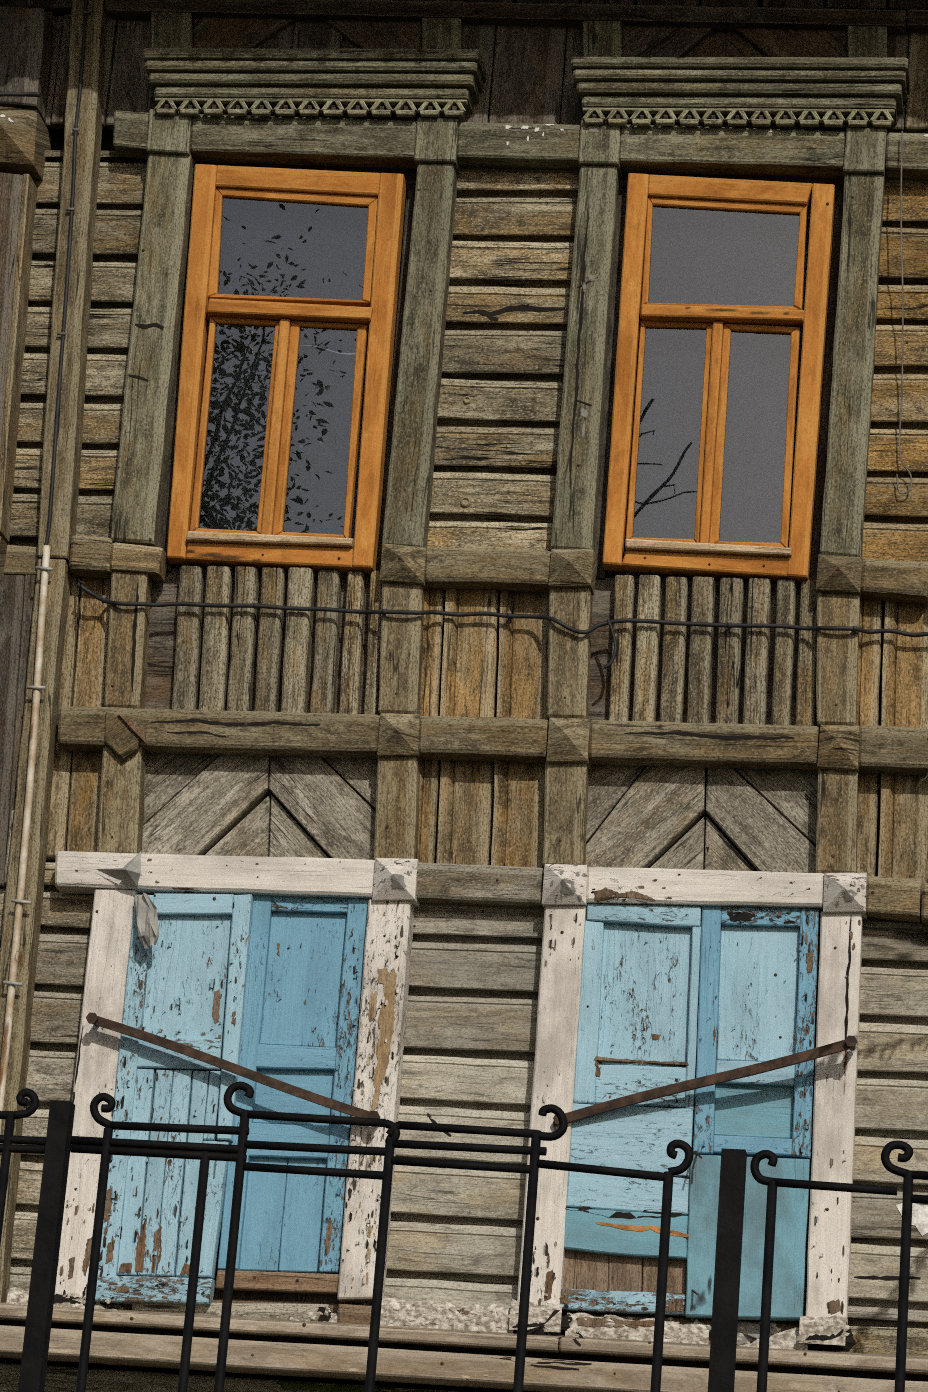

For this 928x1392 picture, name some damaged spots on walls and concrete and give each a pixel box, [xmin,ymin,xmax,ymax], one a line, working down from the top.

peeling [99,1056,158,1137]
peeling [133,998,181,1038]
peeling [201,935,244,1052]
peeling [335,925,404,1165]
peeling [544,870,672,966]
peeling [594,1043,689,1084]
peeling [727,910,814,983]
peeling [795,992,814,1154]
peeling [827,881,865,906]
peeling [54,1155,205,1311]
peeling [325,1179,380,1288]